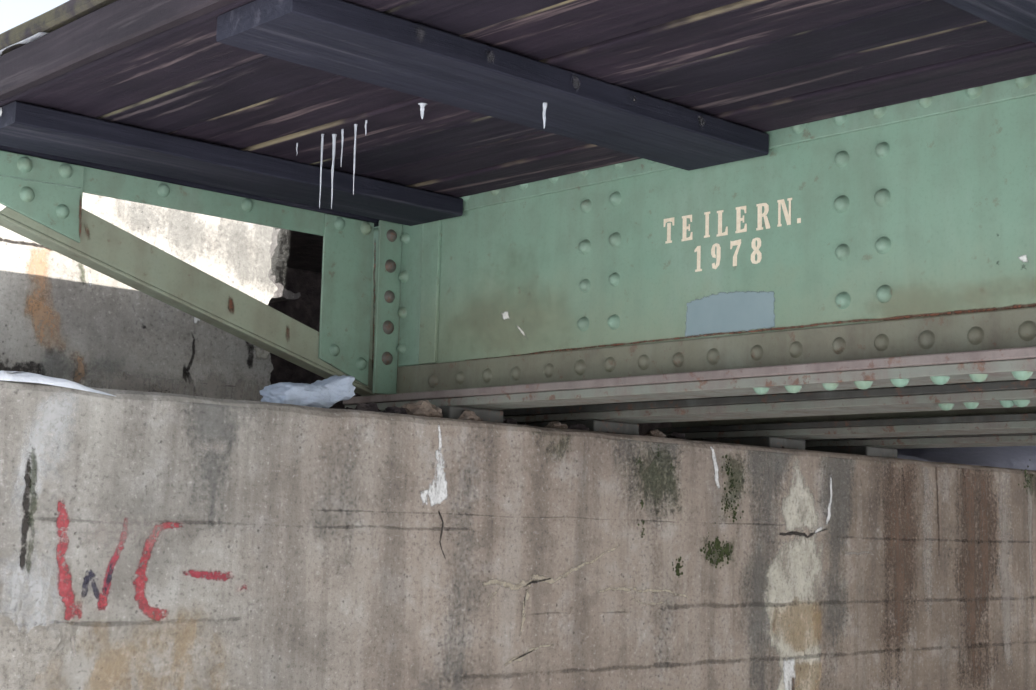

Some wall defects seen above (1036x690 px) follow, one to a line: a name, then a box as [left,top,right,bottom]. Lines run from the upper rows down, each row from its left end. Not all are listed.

corrosion [25,250,62,353]
crack [183,334,236,394]
crack [437,511,445,557]
crack [483,545,619,666]
crack [780,529,827,538]
leakage [815,478,832,532]
leakage [876,462,940,686]
leakage [955,468,1012,688]